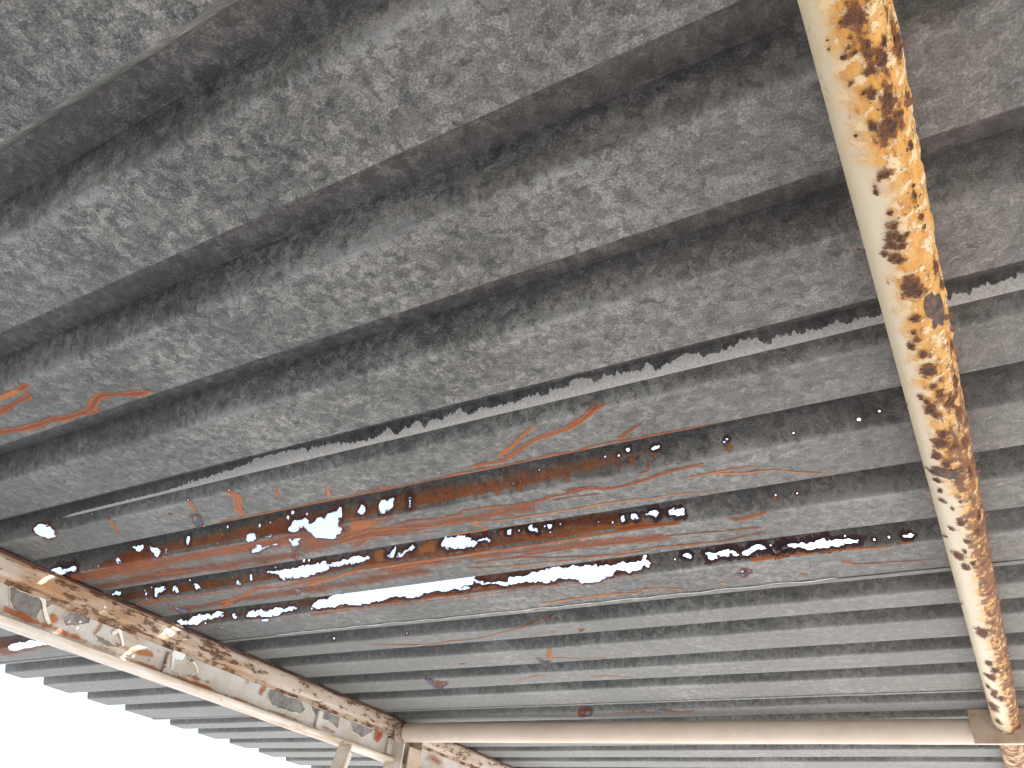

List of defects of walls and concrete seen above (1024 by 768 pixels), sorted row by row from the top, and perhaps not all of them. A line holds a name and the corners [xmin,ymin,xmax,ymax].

rust [825,0,914,155]
rust [873,168,894,196]
rust [878,183,927,265]
rust [0,390,151,434]
rust [900,261,981,571]
rust [0,403,824,722]
peeling [8,586,53,620]
peeling [60,612,121,649]
rust [974,627,991,640]
peeling [267,687,374,738]
rust [983,661,1005,725]
rust [453,743,515,768]